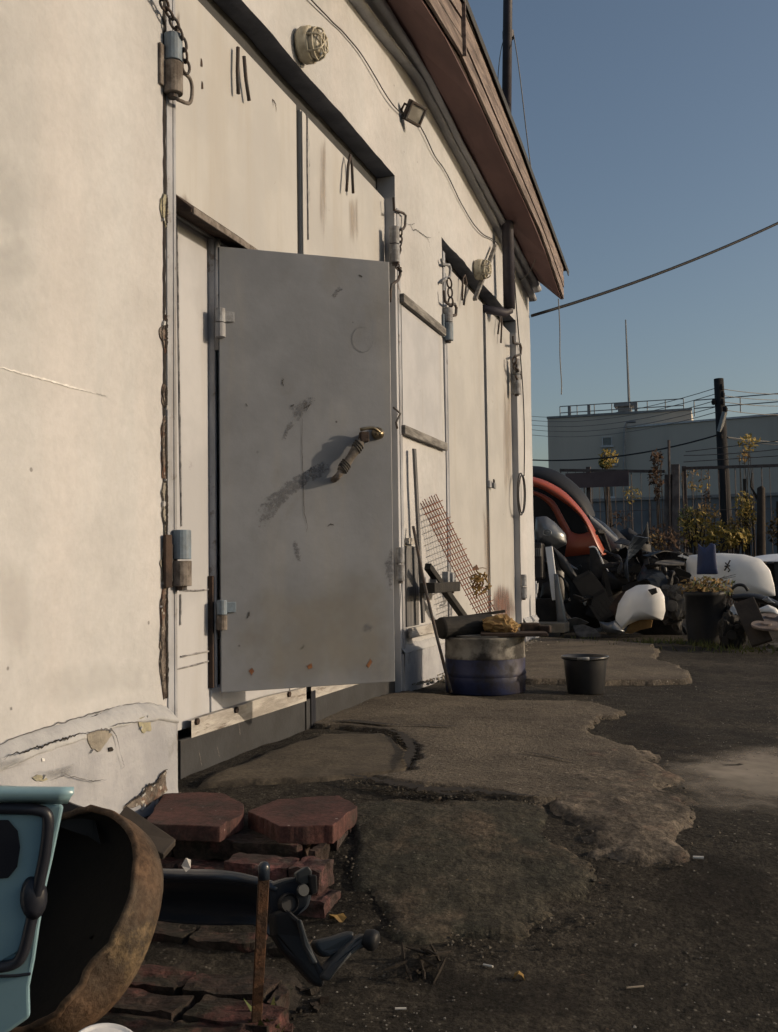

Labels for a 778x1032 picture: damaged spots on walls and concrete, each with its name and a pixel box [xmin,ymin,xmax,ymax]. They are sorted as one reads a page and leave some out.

crack [160,0,168,45]
crack [161,87,169,194]
crack [160,221,168,321]
spalling [159,315,169,353]
crack [160,349,168,417]
spalling [161,384,169,534]
peeling [260,464,328,522]
spalling [159,548,169,700]
crack [0,702,156,782]
spalling [87,728,113,754]
spalling [123,769,168,810]